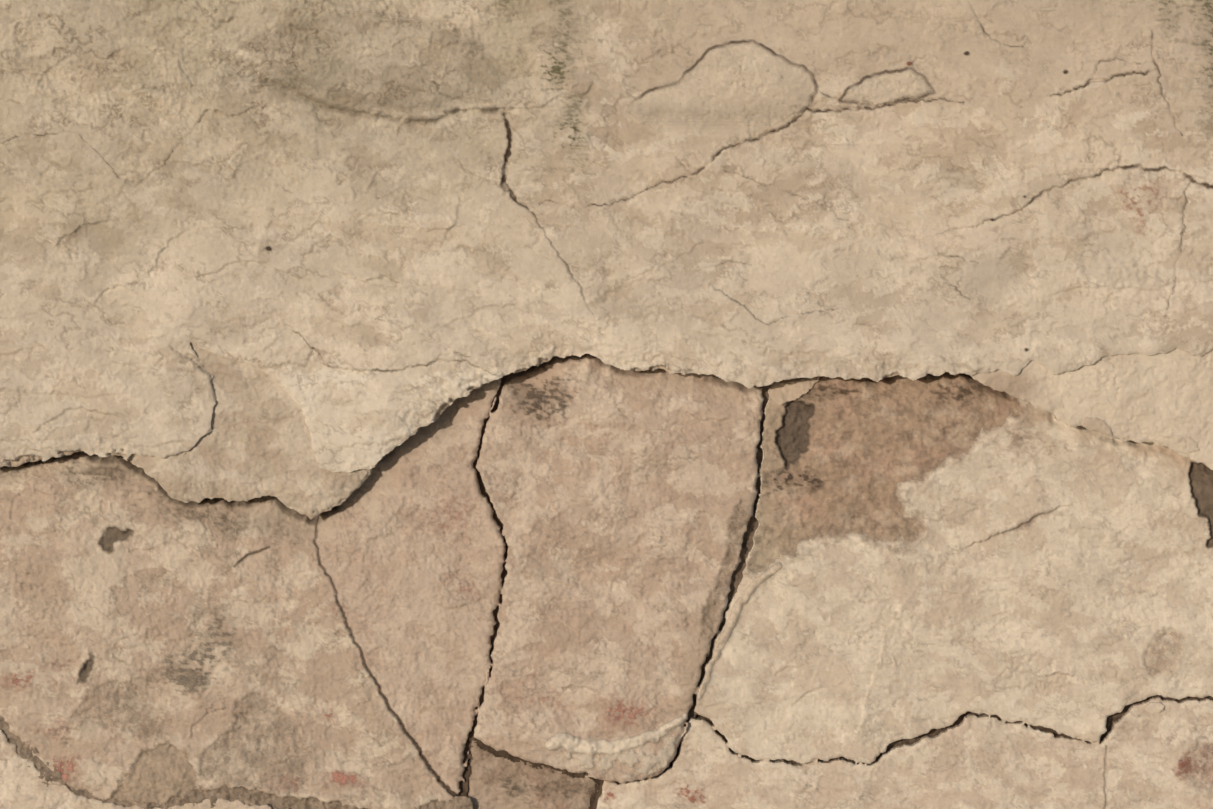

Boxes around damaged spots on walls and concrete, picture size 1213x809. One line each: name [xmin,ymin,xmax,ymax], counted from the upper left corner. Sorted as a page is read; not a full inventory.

crack [1054,63,1162,95]
crack [502,113,527,207]
crack [592,94,964,206]
crack [1068,165,1213,233]
flaking render [128,342,373,519]
spalling [99,527,133,553]
crack [316,372,619,809]
crack [660,384,1213,774]
peeling [697,348,1213,700]
peeling [78,654,312,804]
peeling [545,712,688,776]